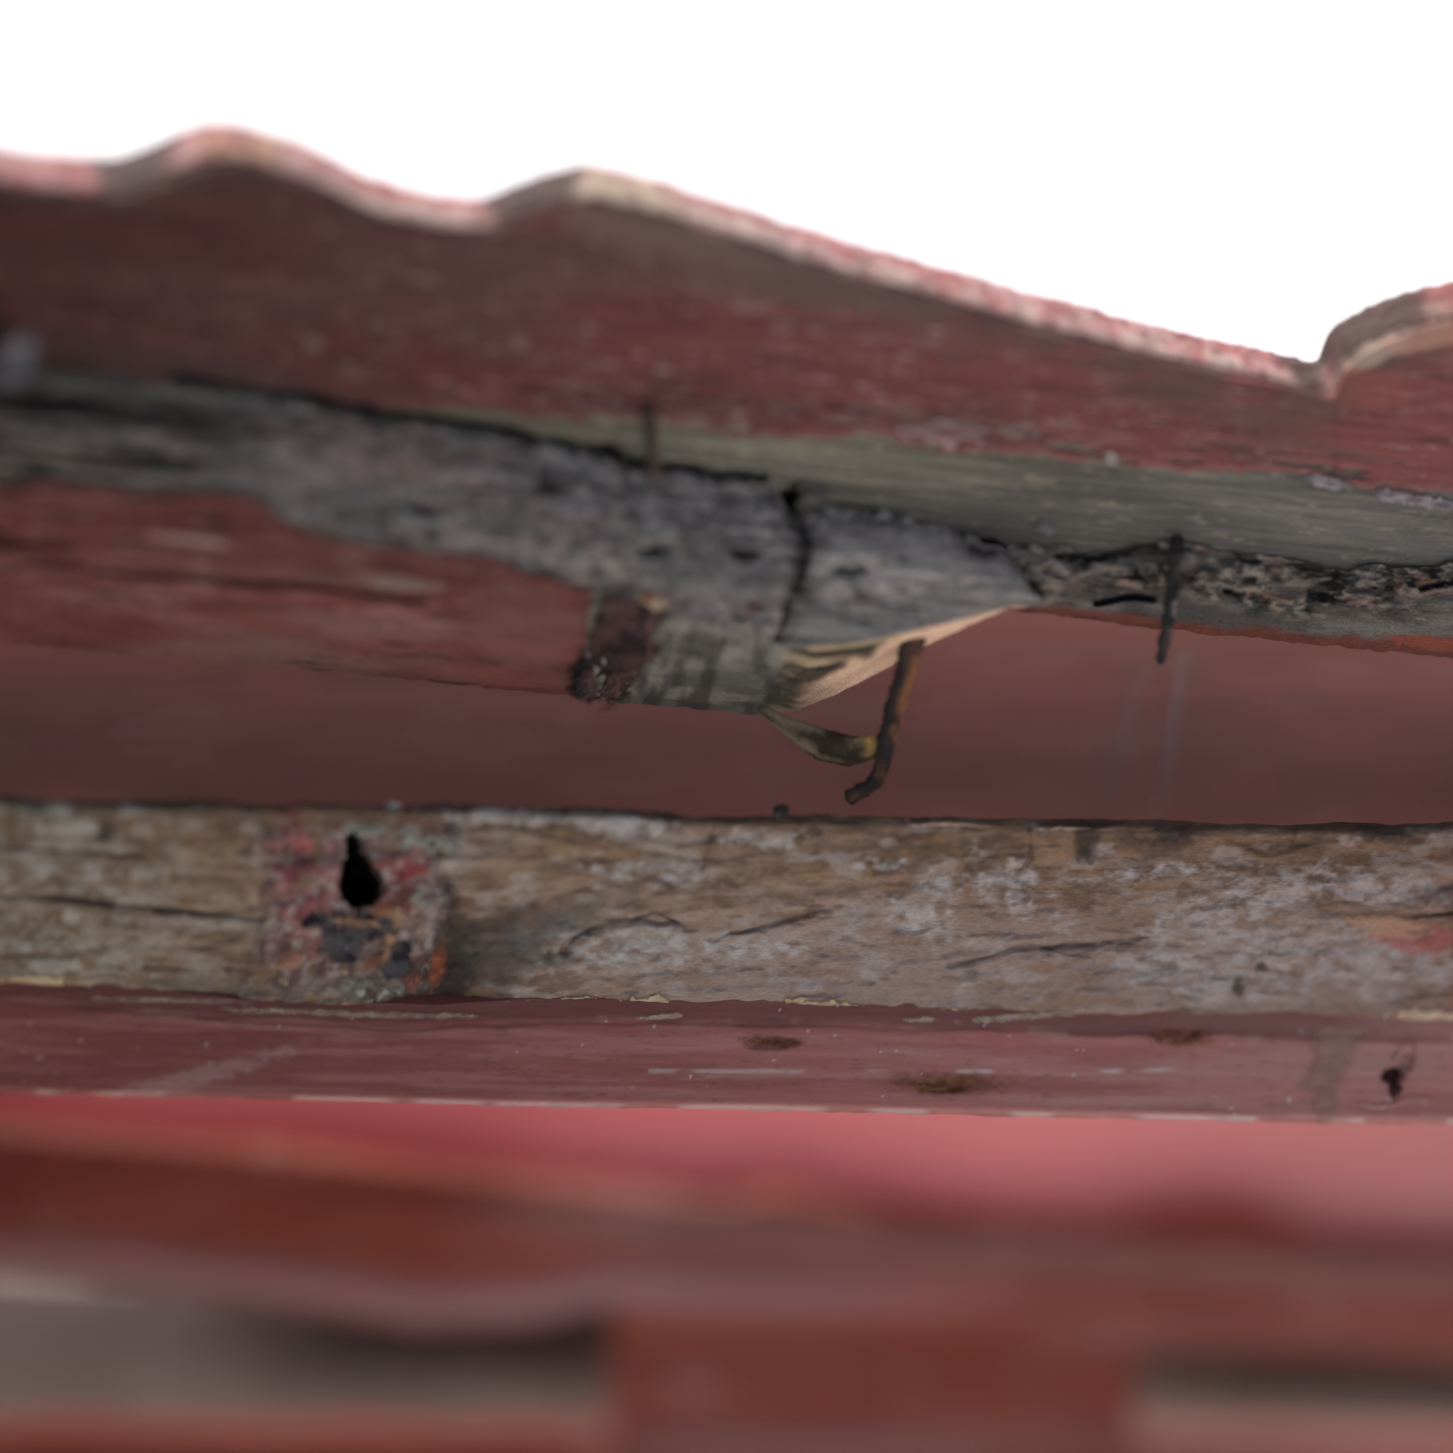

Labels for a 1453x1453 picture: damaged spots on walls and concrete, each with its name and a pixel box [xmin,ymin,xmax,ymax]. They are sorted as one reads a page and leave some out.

peeling [879,418,1048,452]
peeling [1305,474,1351,490]
peeling [1374,488,1453,511]
crack [783,534,808,621]
peeling [636,591,671,611]
spalling [95,803,474,1019]
spalling [0,975,76,986]
spalling [620,994,682,1019]
spalling [785,997,859,1006]
spalling [909,1008,1083,1023]